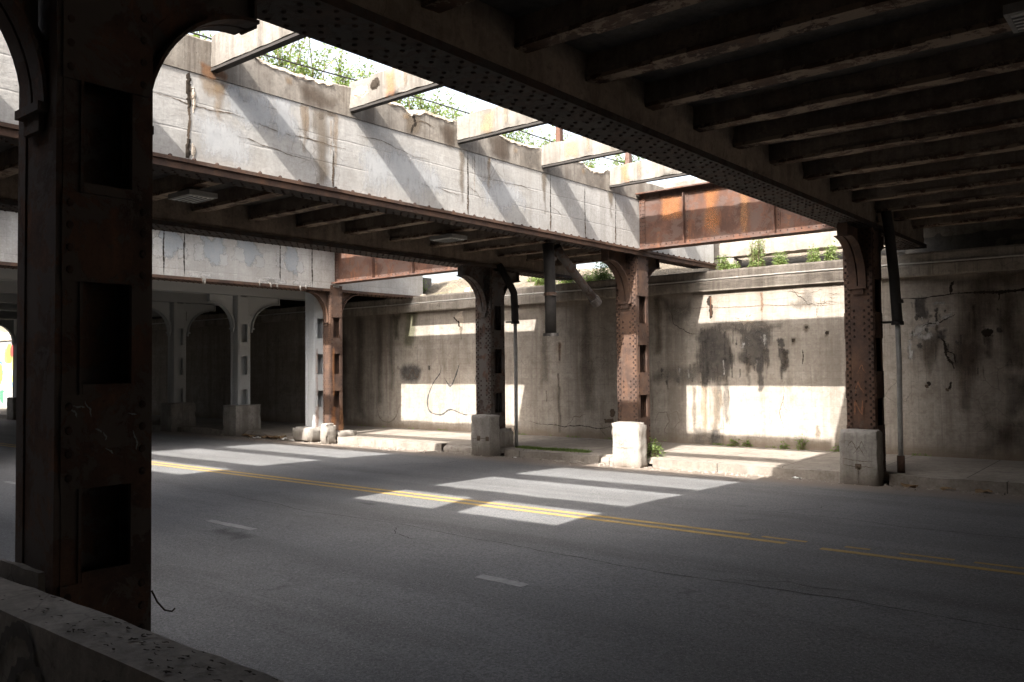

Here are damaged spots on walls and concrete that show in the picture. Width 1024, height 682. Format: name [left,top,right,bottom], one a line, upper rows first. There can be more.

crack [153,88,586,237]
peeling [153,231,304,274]
leakage [655,299,789,392]
crack [941,338,956,368]
leakage [908,272,1024,390]